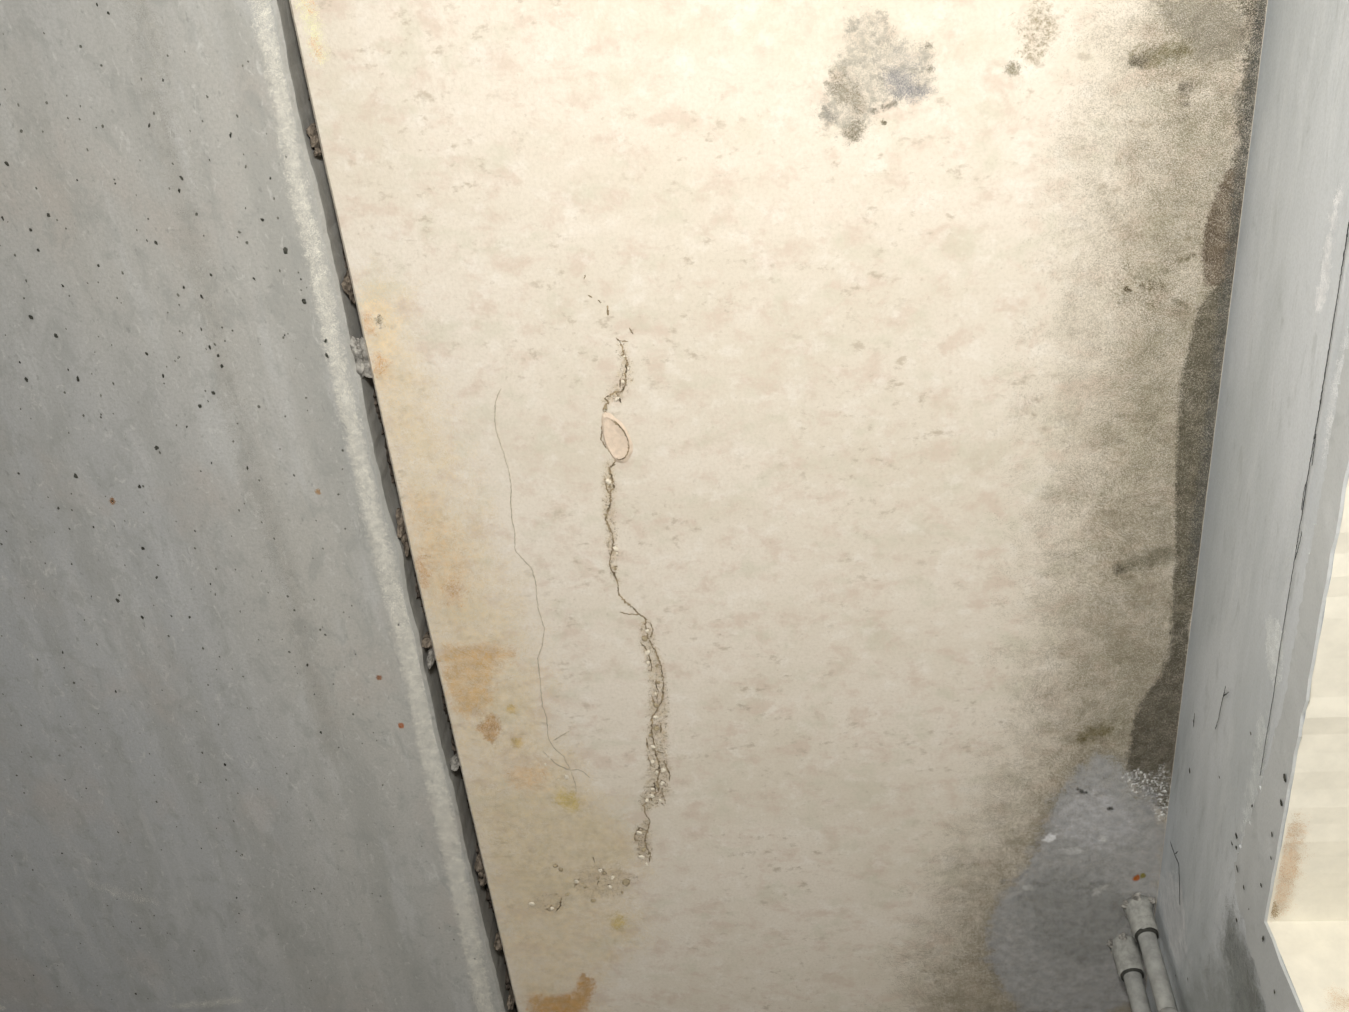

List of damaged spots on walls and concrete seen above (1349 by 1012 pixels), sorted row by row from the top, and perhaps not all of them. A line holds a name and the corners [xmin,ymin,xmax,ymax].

leakage [808,6,941,146]
crack [494,391,590,788]
crack [529,275,674,915]